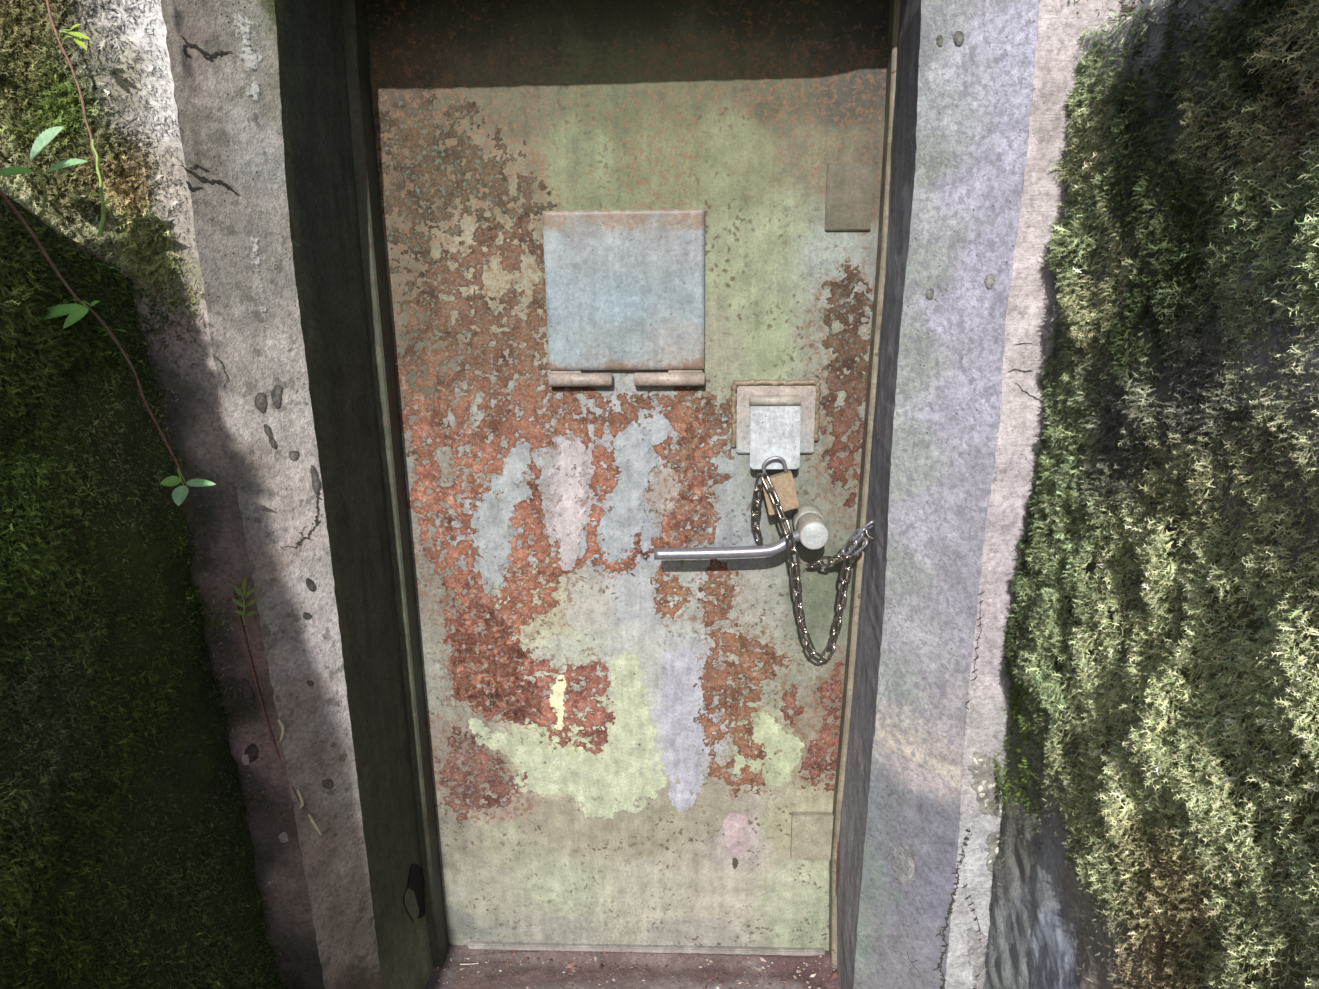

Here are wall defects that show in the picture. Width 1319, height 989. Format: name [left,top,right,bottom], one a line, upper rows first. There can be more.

crack [181,35,232,61]
crack [180,164,239,195]
rust [373,73,804,797]
rust [816,260,873,508]
peeling [468,408,672,597]
rust [434,725,528,822]
peeling [468,645,705,820]
peeling [733,712,805,787]
rust [798,660,846,792]